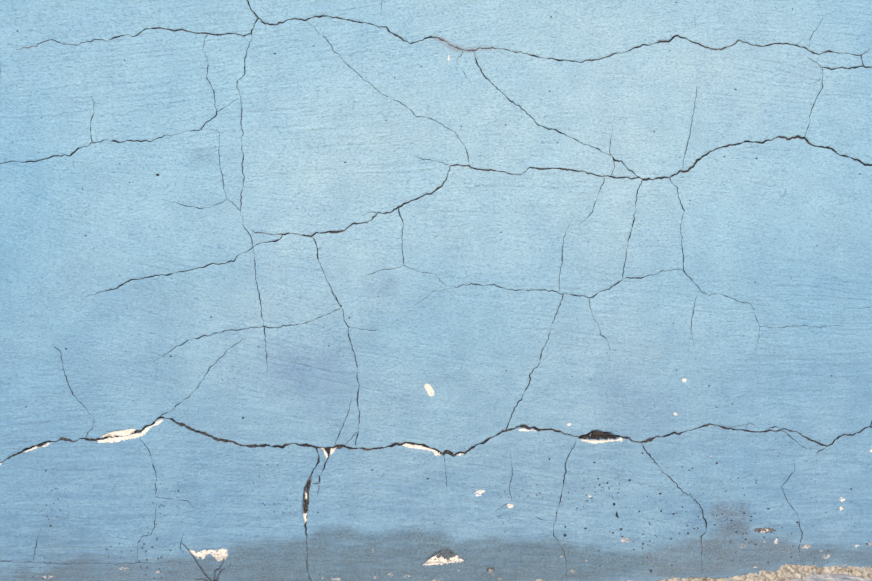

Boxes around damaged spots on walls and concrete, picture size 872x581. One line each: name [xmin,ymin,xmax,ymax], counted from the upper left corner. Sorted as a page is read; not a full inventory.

crack [0,0,872,372]
spalling [97,419,163,443]
crack [0,330,872,581]
spalling [580,430,622,444]
spalling [303,476,312,524]
spalling [423,549,464,572]